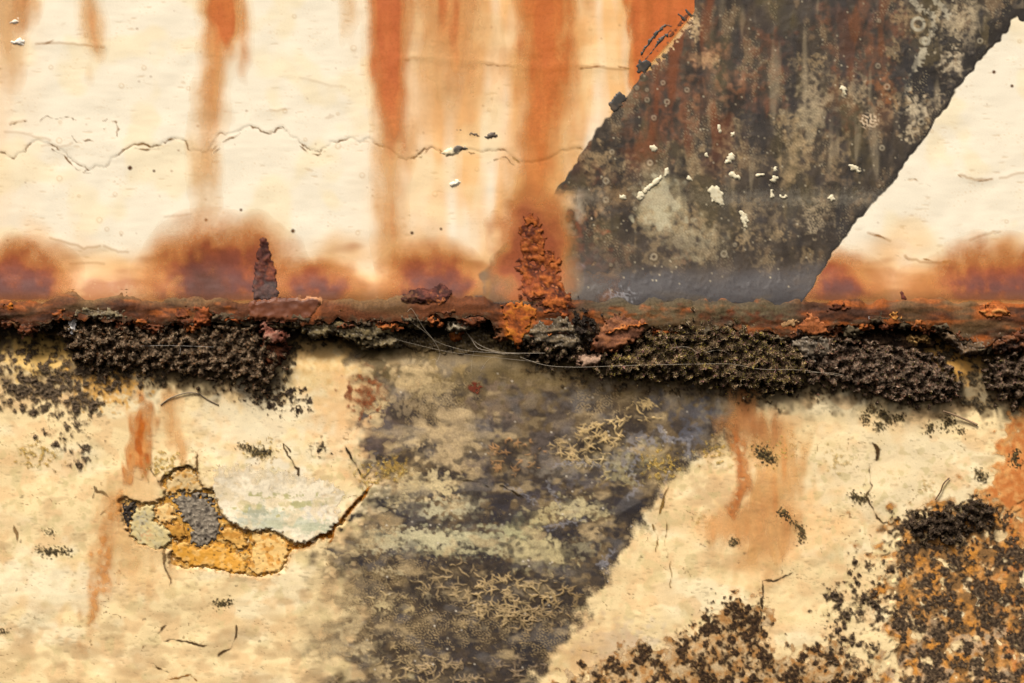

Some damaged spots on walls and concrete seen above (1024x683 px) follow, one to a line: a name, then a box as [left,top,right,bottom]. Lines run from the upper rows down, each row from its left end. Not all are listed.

rust [0,0,1024,354]
rust [89,394,185,622]
spalling [119,464,349,577]
rust [709,386,798,564]